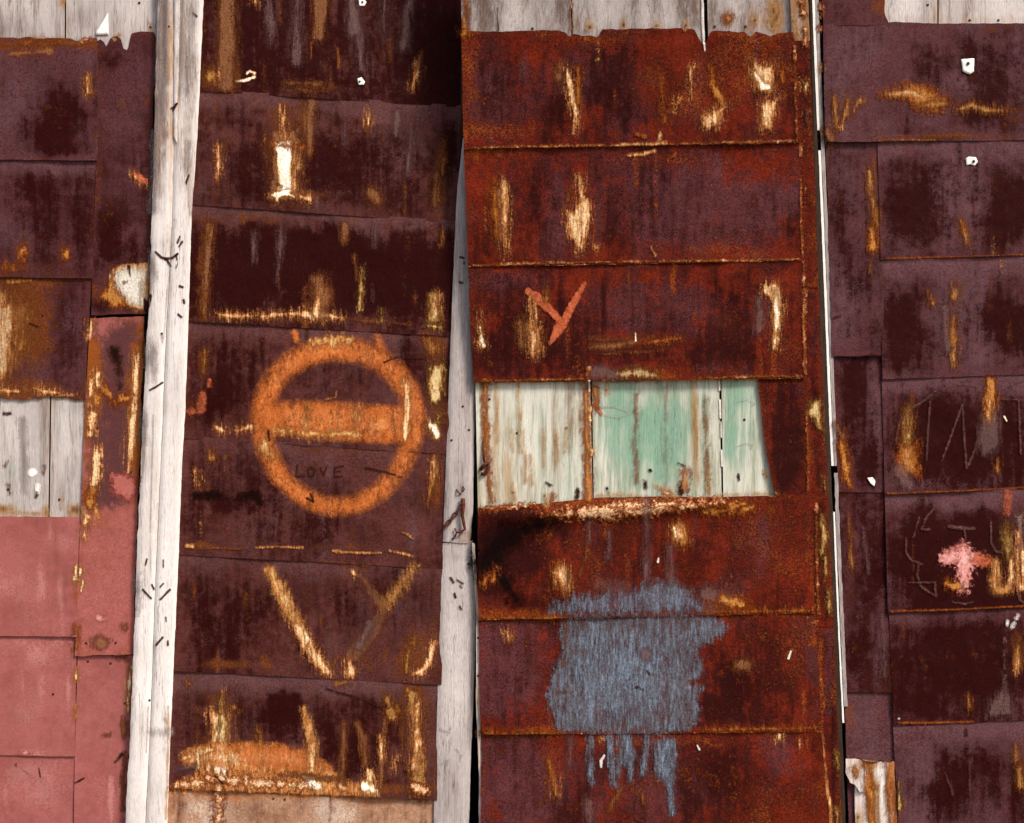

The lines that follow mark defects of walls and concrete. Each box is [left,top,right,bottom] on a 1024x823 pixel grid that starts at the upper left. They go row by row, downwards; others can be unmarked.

corrosion [202,0,243,98]
corrosion [472,19,803,162]
corrosion [822,80,1012,148]
corrosion [196,220,411,326]
corrosion [472,175,807,379]
corrosion [122,329,145,474]
corrosion [549,542,590,597]
corrosion [668,519,694,552]
corrosion [890,605,1024,698]
corrosion [376,686,435,804]
corrosion [702,723,833,823]
corrosion [848,759,905,823]